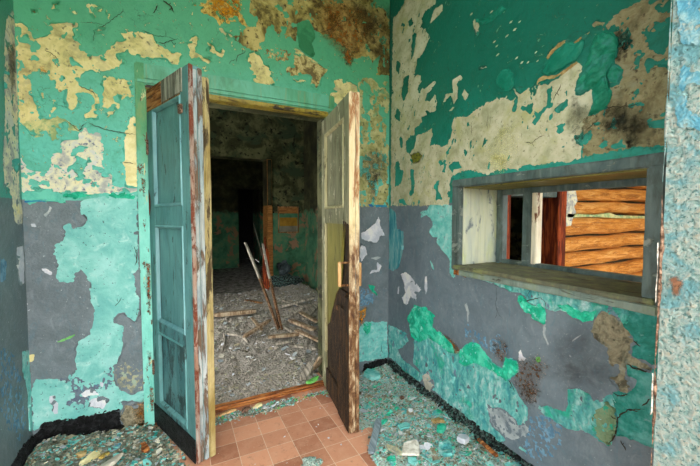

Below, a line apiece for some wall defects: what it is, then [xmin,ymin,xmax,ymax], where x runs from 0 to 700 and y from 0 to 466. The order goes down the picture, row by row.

rust [319,1,371,65]
peeling [192,0,700,278]
leakage [604,108,645,148]
peeling [3,0,225,432]
peeling [359,305,528,442]
rust [515,359,542,403]
peeling [483,195,665,466]